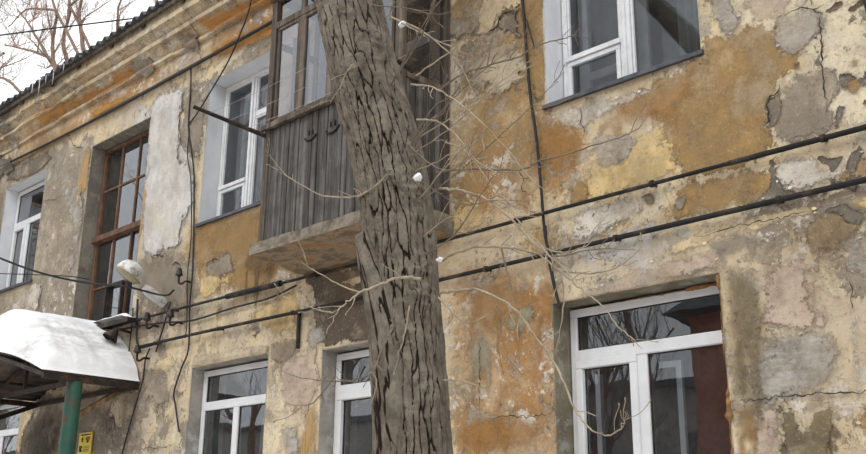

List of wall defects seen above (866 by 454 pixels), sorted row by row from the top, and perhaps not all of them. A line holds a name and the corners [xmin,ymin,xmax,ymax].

peeling [450,0,544,102]
crack [784,0,828,109]
peeling [7,152,52,181]
peeling [200,251,235,298]
peeling [552,0,866,454]
crack [736,390,866,405]